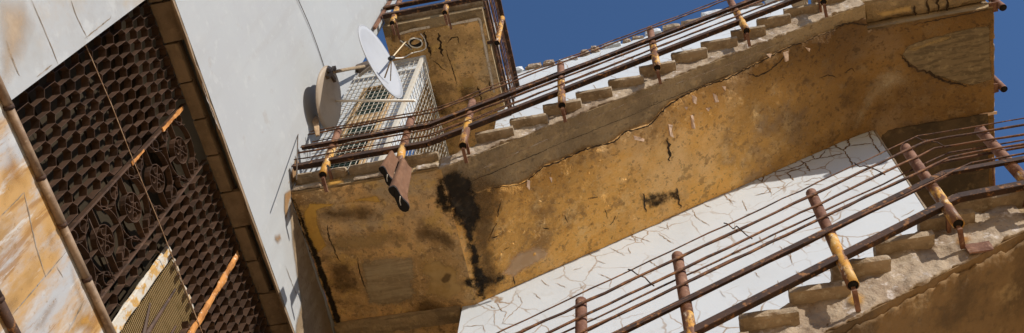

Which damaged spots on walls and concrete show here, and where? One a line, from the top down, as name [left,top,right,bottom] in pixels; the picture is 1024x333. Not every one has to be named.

crack [423,32,492,101]
crack [472,22,880,250]
peeling [685,86,726,129]
water stain [434,172,547,300]
crack [463,197,671,328]
water stain [643,189,682,212]